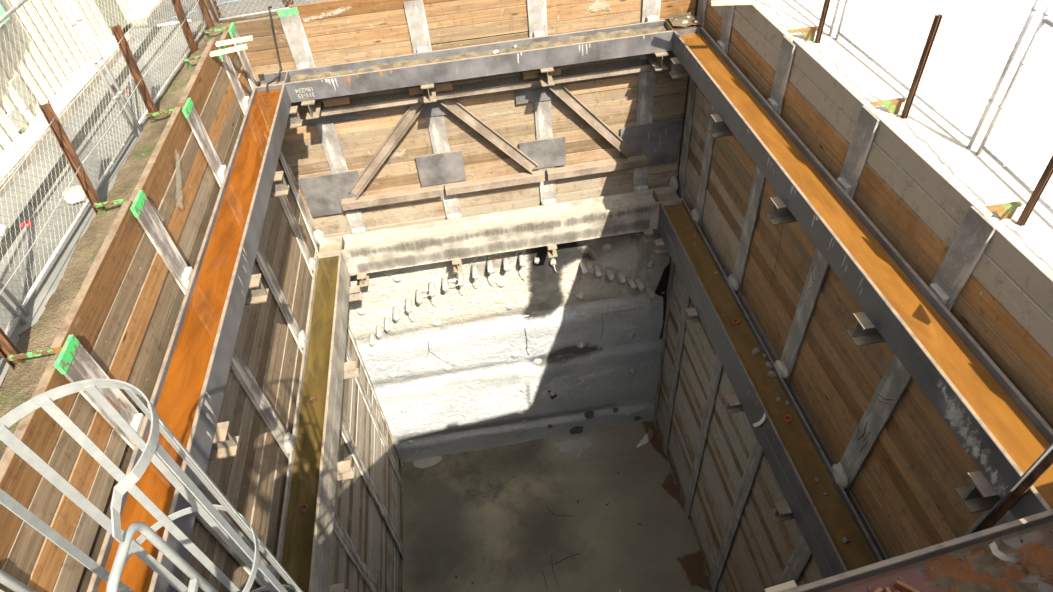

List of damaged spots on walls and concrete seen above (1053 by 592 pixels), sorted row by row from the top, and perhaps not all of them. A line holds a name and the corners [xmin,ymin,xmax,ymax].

leakage [523,241,591,318]
leakage [530,346,601,366]
rust [924,542,1053,592]